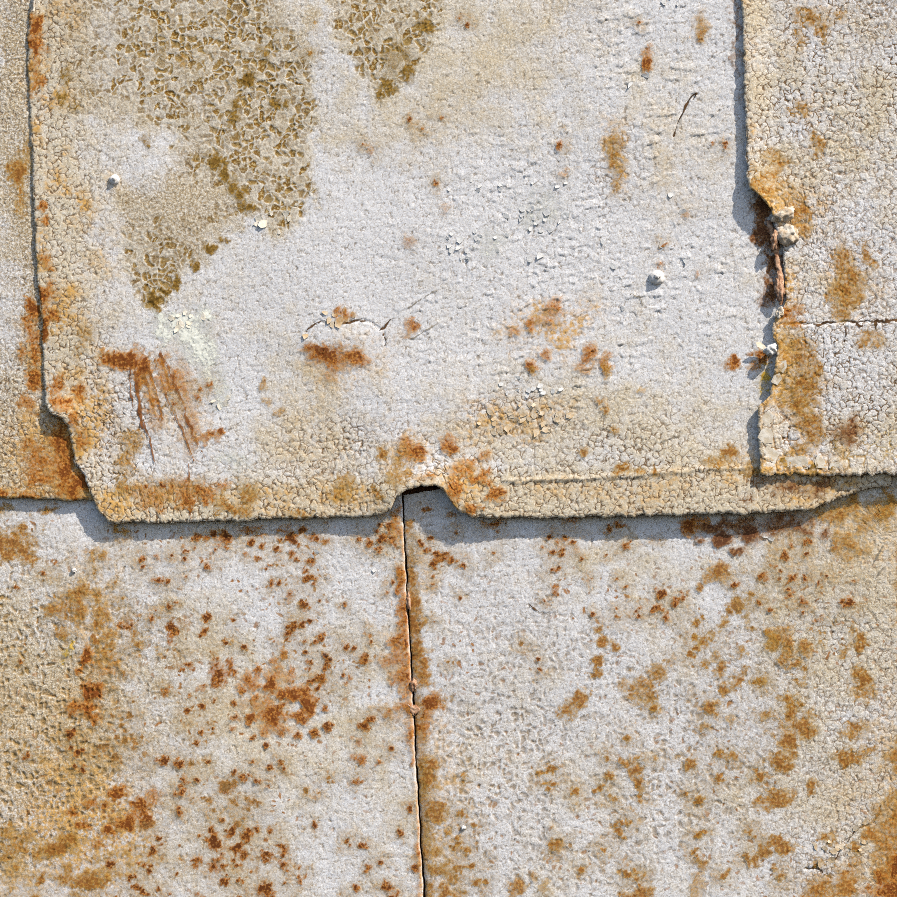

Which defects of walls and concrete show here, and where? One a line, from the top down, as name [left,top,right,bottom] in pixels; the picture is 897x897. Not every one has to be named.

peeling [253,203,299,228]
corrosion [0,255,91,515]
corrosion [300,343,371,379]
crack [306,290,437,346]
corrosion [725,145,863,455]
crack [780,318,897,342]
corrosion [44,548,200,816]
corrosion [180,592,335,749]
corrosion [678,487,897,732]
corrosion [752,691,818,813]
corrosion [190,769,307,897]
corrosion [742,828,798,882]